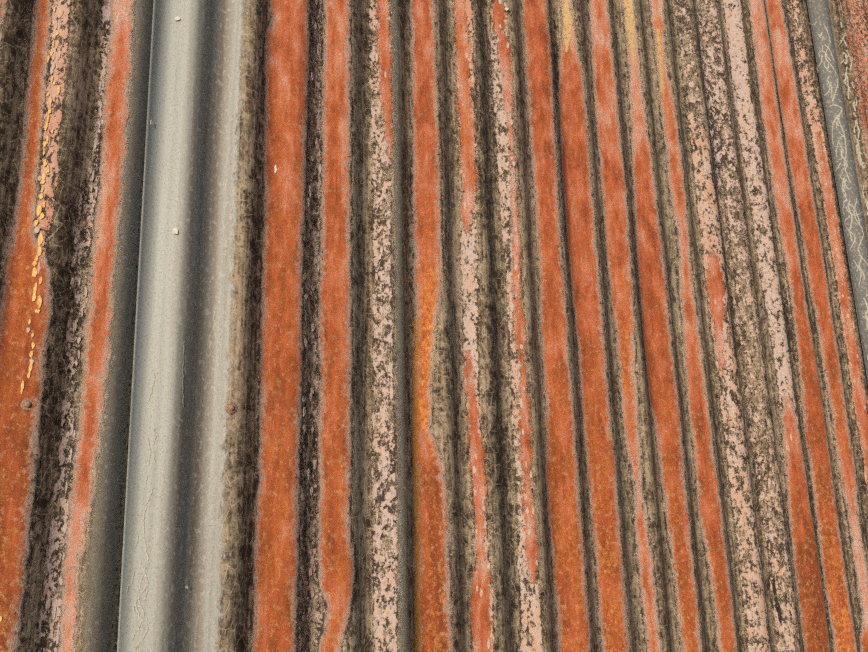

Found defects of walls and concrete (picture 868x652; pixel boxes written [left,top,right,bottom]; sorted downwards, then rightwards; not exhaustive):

corrosion [0,0,56,652]
corrosion [58,0,135,652]
corrosion [250,0,357,652]
corrosion [408,0,453,652]
corrosion [453,0,478,234]
corrosion [463,349,494,652]
corrosion [491,0,539,584]
corrosion [521,0,738,652]
peeling [674,0,801,652]
corrosion [747,0,868,652]